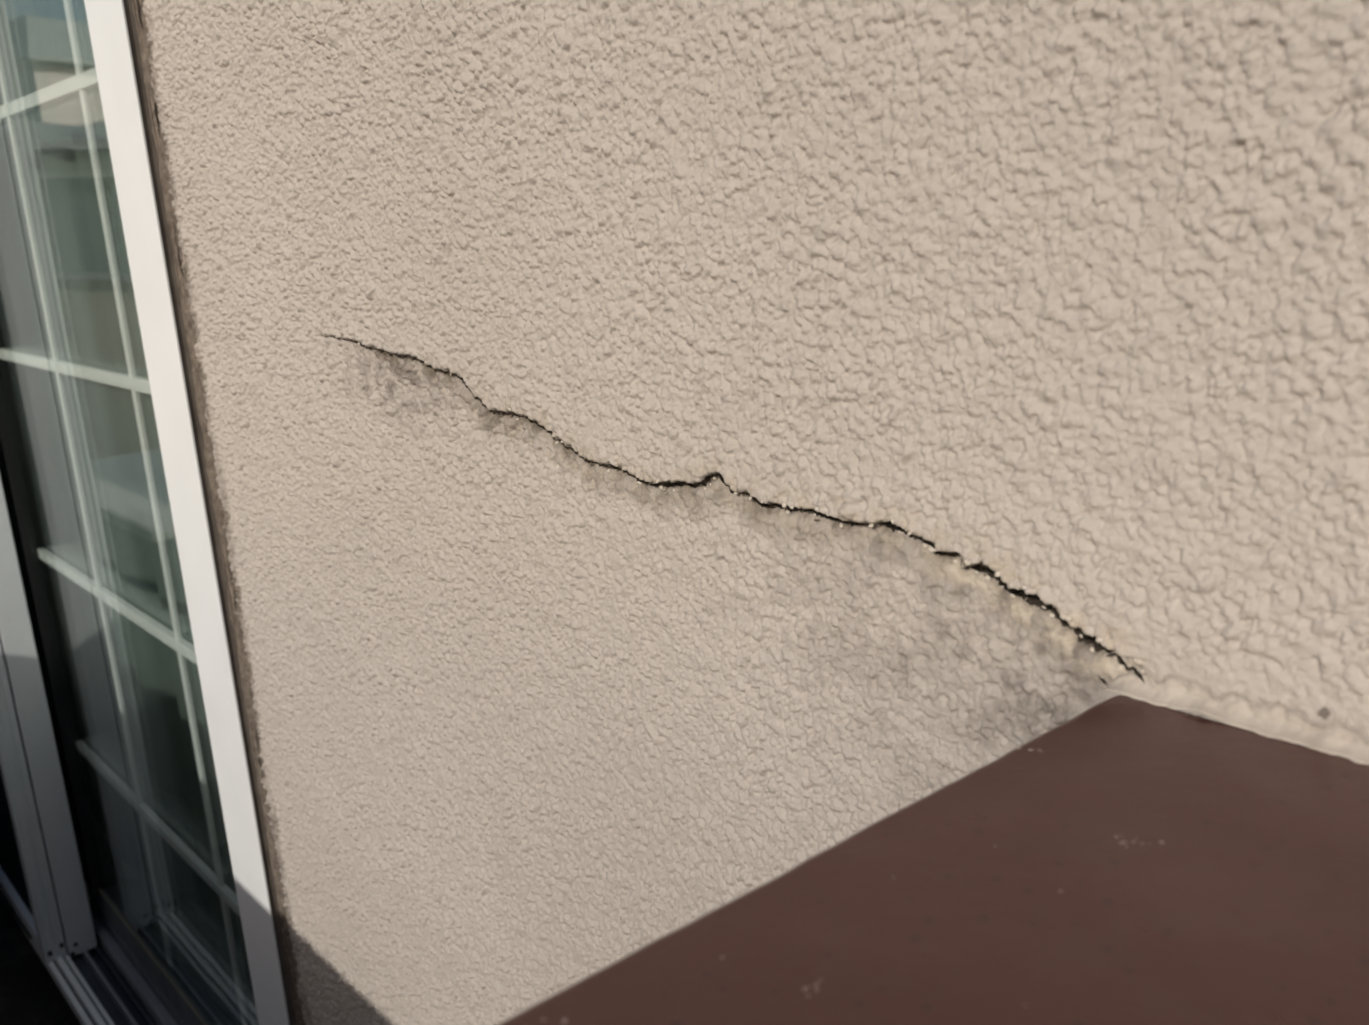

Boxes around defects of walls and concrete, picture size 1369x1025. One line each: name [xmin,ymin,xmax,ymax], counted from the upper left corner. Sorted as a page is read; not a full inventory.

crack [322,335,1146,685]